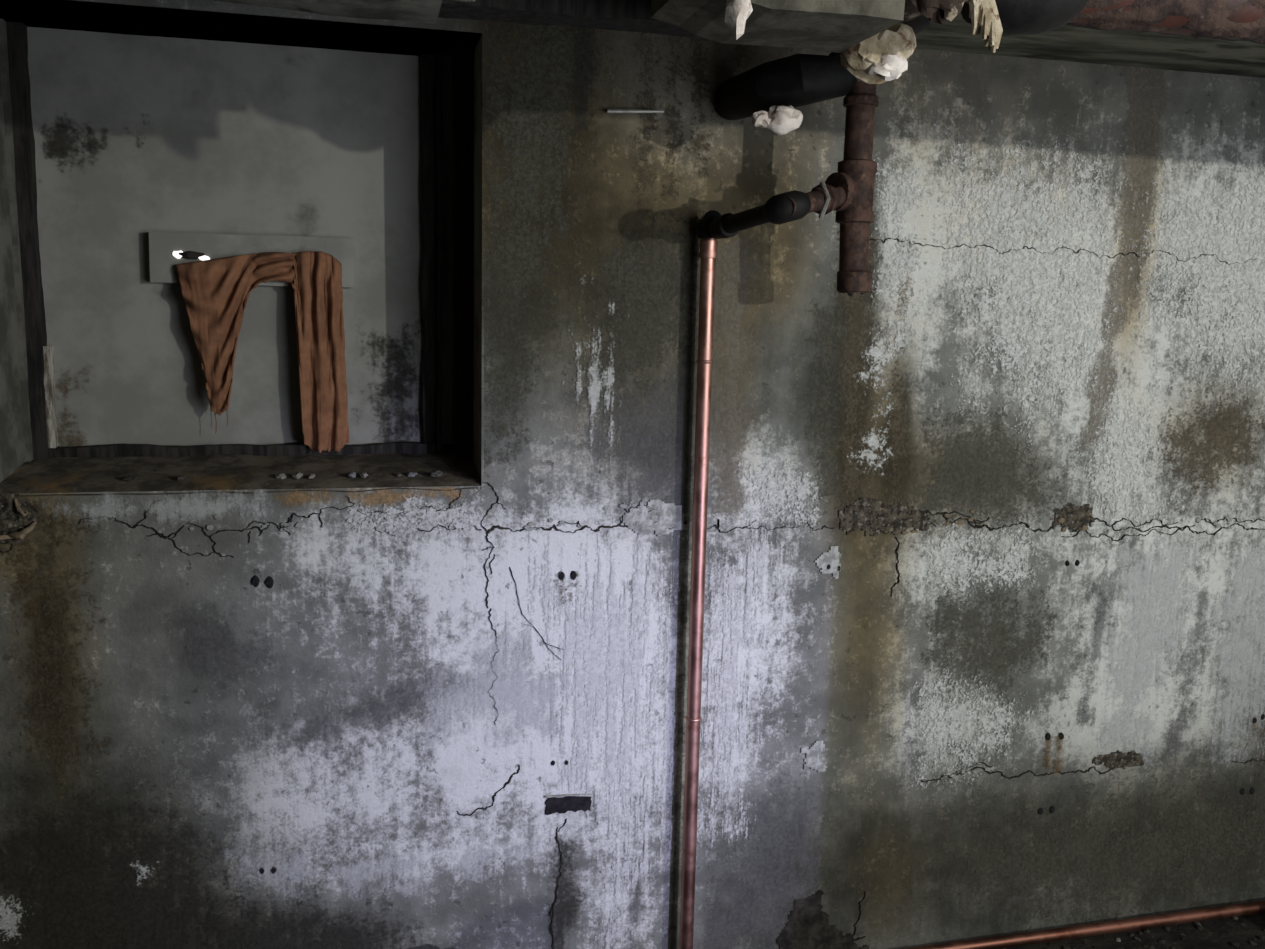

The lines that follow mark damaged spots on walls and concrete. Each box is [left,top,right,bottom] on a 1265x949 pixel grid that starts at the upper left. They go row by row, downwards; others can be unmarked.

leakage [575,33,713,503]
crack [869,238,1257,265]
leakage [697,66,1265,949]
crack [79,482,1265,726]
crack [457,765,520,816]
crack [922,752,1133,783]
leakage [0,794,456,949]
crack [549,818,567,949]
spalling [776,890,869,949]